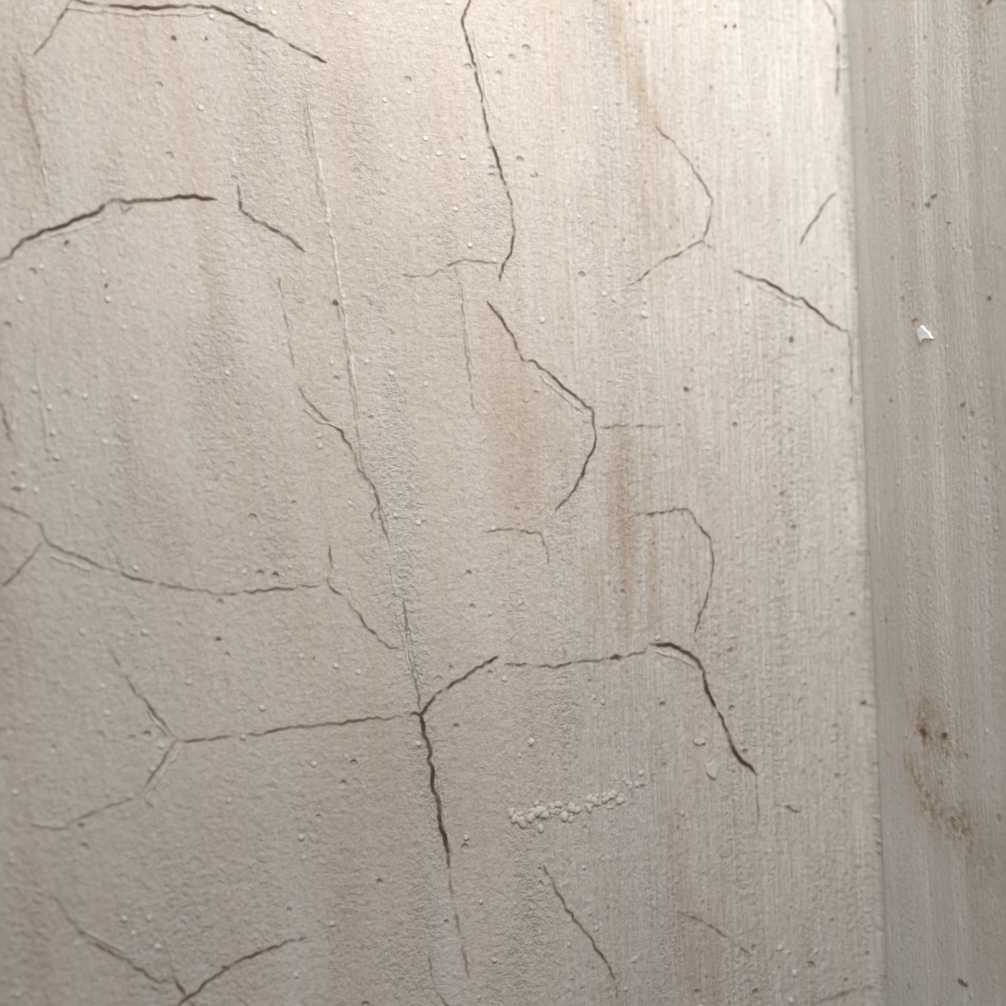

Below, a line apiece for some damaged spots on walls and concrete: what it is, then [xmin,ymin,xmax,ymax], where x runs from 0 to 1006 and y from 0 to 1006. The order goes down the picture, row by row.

crack [59,0,327,63]
crack [461,0,515,278]
crack [0,143,304,269]
crack [639,221,710,281]
crack [801,195,832,242]
crack [739,271,851,344]
crack [487,300,597,508]
crack [231,585,340,595]
crack [359,508,756,866]
crack [250,716,388,735]
crack [544,867,611,971]
crack [85,930,304,1006]